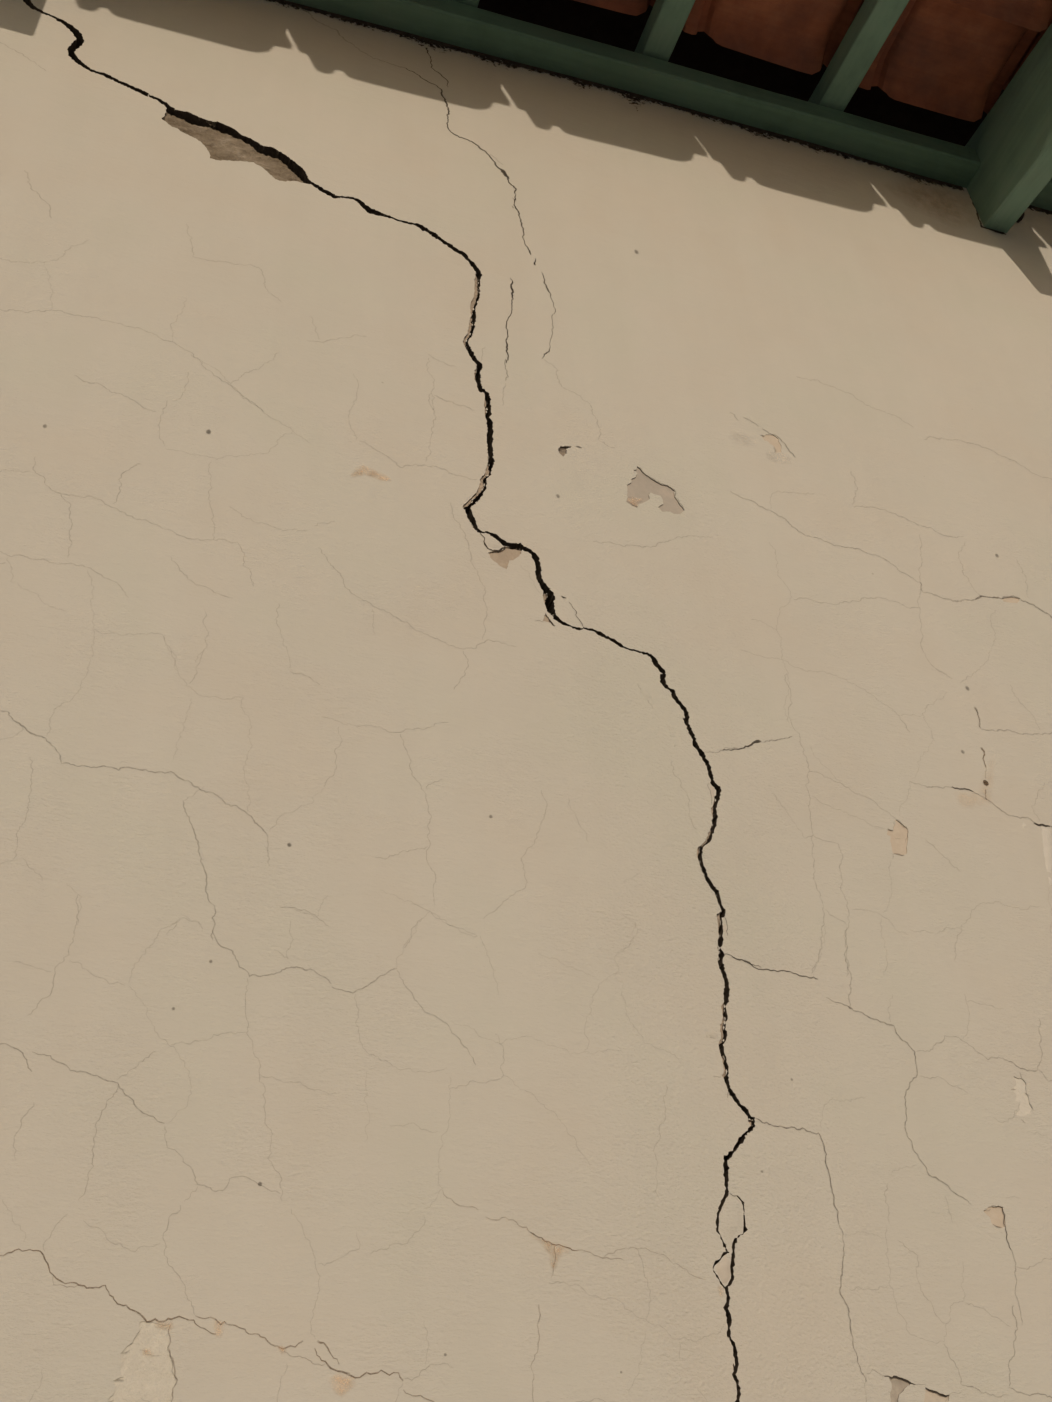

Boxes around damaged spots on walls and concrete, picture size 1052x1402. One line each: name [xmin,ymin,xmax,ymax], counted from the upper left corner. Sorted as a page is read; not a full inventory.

spalling [162,109,304,183]
peeling [626,467,684,514]
crack [9,0,839,1402]
peeling [889,1377,950,1402]